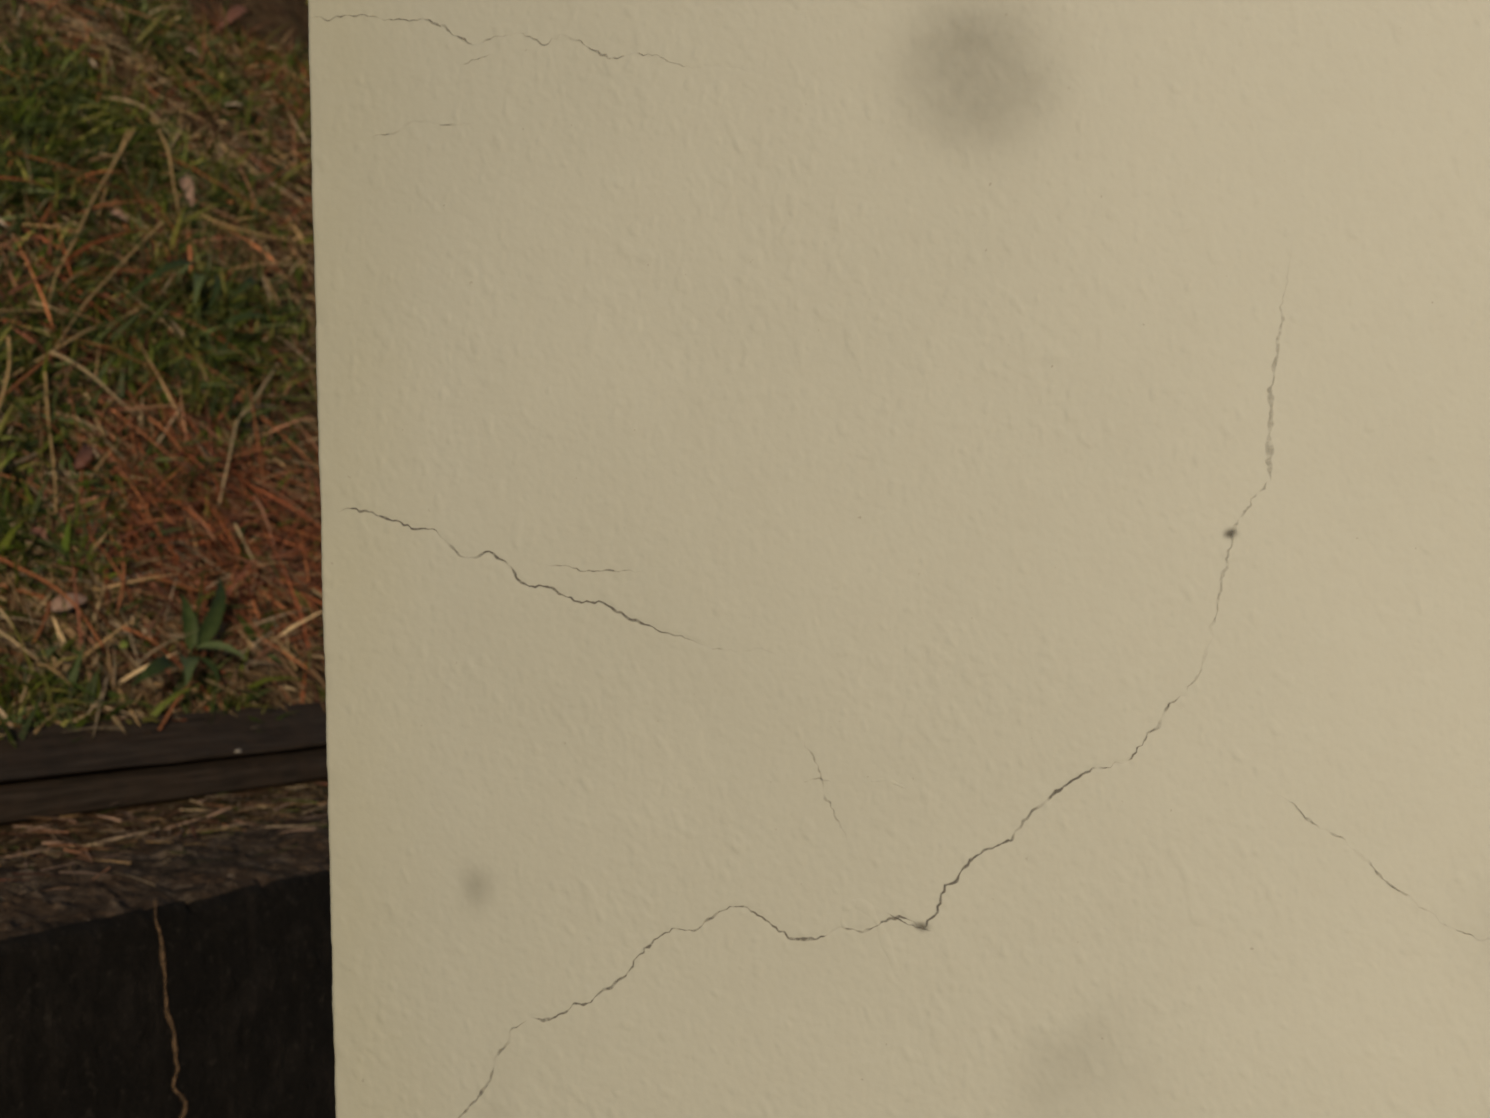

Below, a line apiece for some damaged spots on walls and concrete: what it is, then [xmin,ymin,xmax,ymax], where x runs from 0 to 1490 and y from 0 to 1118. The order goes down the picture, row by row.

crack [349,508,436,531]
crack [483,551,667,633]
crack [500,701,1174,1051]
crack [156,903,188,1118]